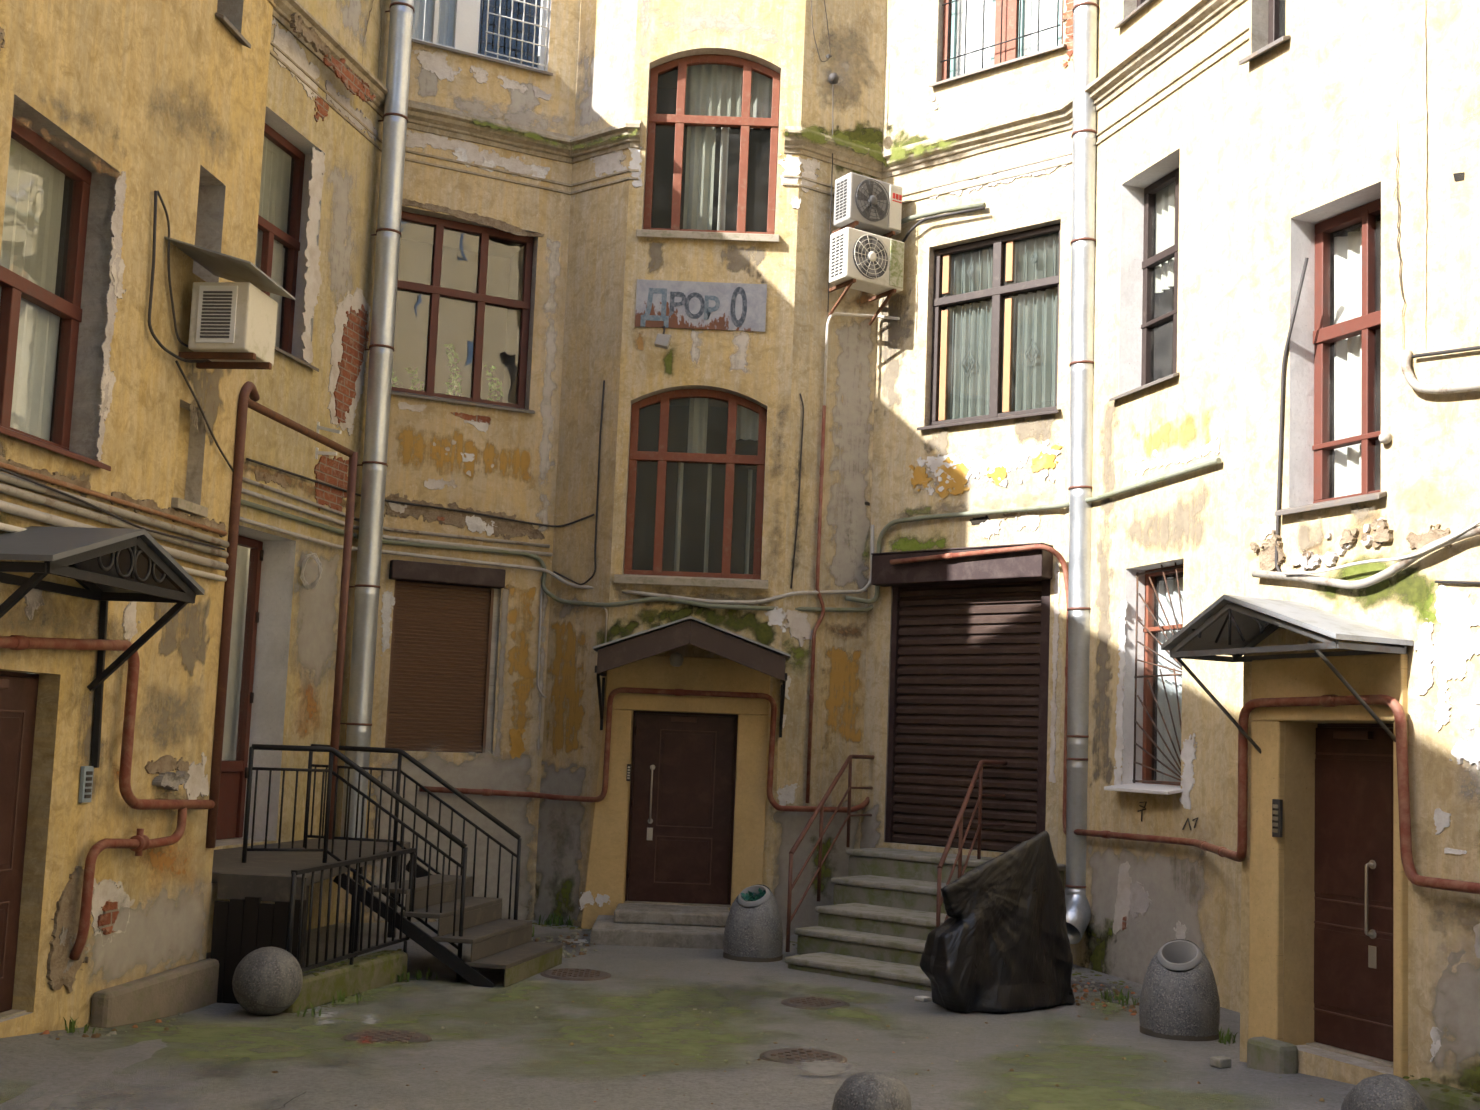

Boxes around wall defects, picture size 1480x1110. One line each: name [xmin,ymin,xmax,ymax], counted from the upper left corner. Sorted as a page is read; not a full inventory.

peeling [272,12,378,141]
flaking render [300,147,371,436]
flaking render [398,402,427,412]
flaking render [451,412,491,433]
flaking render [314,455,349,512]
flaking render [384,440,545,540]
peeling [909,439,1063,502]
flaking render [1290,517,1452,572]
peeling [1413,585,1480,797]
flaking render [145,752,209,810]
peeling [1434,808,1467,855]
peeling [1430,1027,1443,1062]